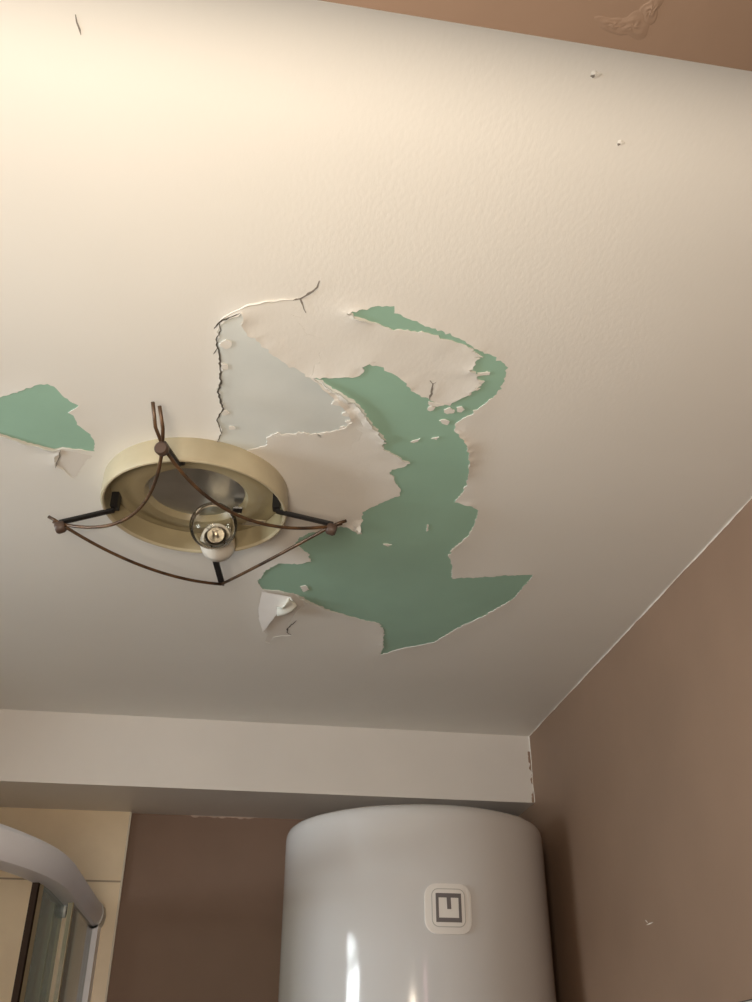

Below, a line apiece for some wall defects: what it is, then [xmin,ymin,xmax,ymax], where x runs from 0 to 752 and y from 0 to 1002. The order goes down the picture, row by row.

peeling [0,371,110,487]
peeling [198,286,548,670]